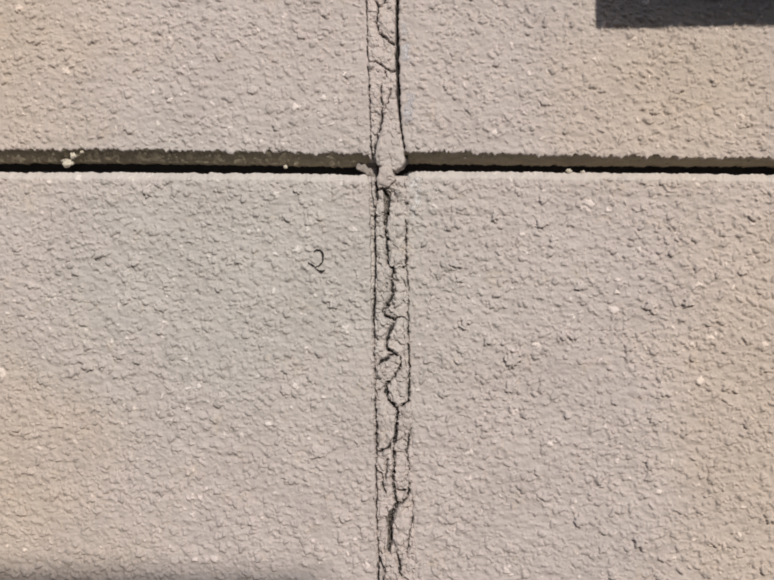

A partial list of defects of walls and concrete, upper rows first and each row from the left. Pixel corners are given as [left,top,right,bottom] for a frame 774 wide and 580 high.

crack [366,0,414,580]